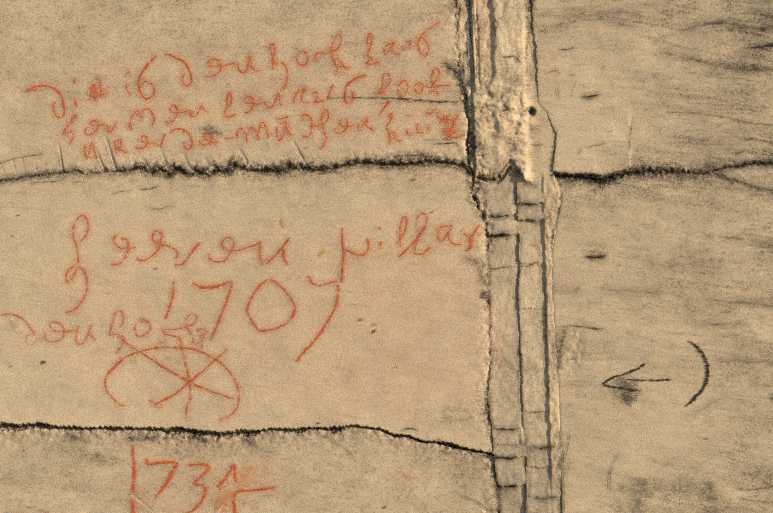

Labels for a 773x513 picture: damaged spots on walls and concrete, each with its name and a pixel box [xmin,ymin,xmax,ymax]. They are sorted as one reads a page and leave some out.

crack [0,0,773,398]
crack [0,288,570,513]